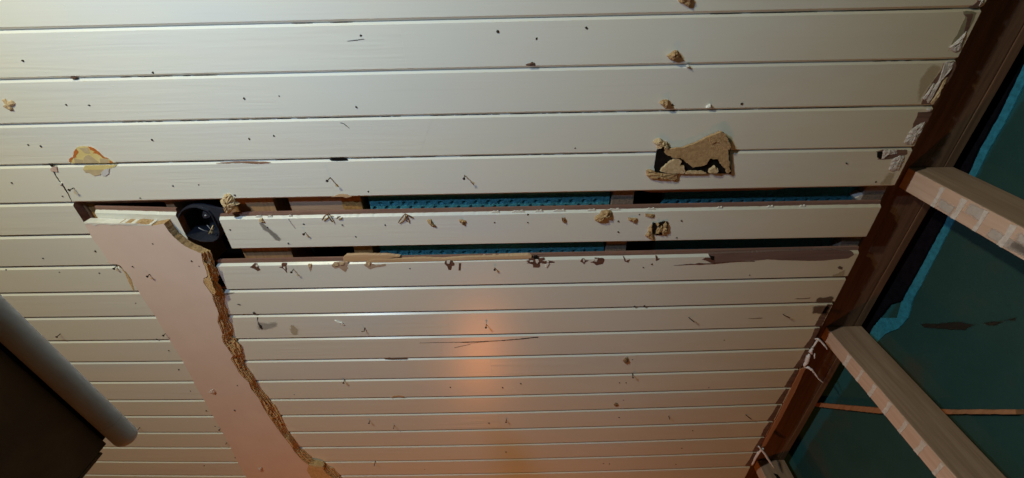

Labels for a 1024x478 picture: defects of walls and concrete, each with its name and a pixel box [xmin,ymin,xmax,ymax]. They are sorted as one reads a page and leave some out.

peeling [876,0,984,171]
peeling [68,145,116,176]
crack [117,158,214,166]
crack [50,164,81,201]
spalling [332,261,349,272]